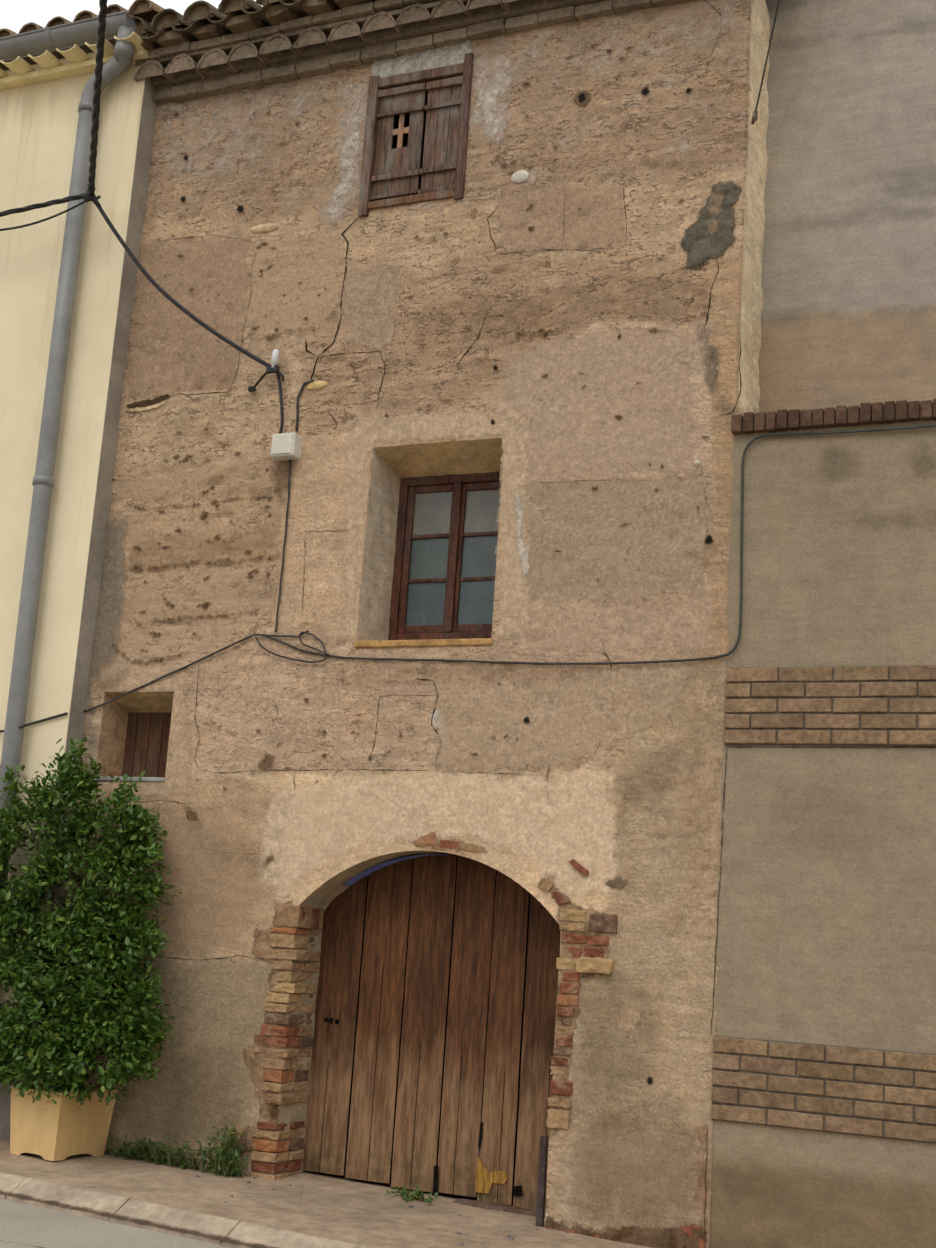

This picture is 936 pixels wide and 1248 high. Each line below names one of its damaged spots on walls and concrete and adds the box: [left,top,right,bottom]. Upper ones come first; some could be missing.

crack [305,217,399,430]
peeling [226,664,720,1180]